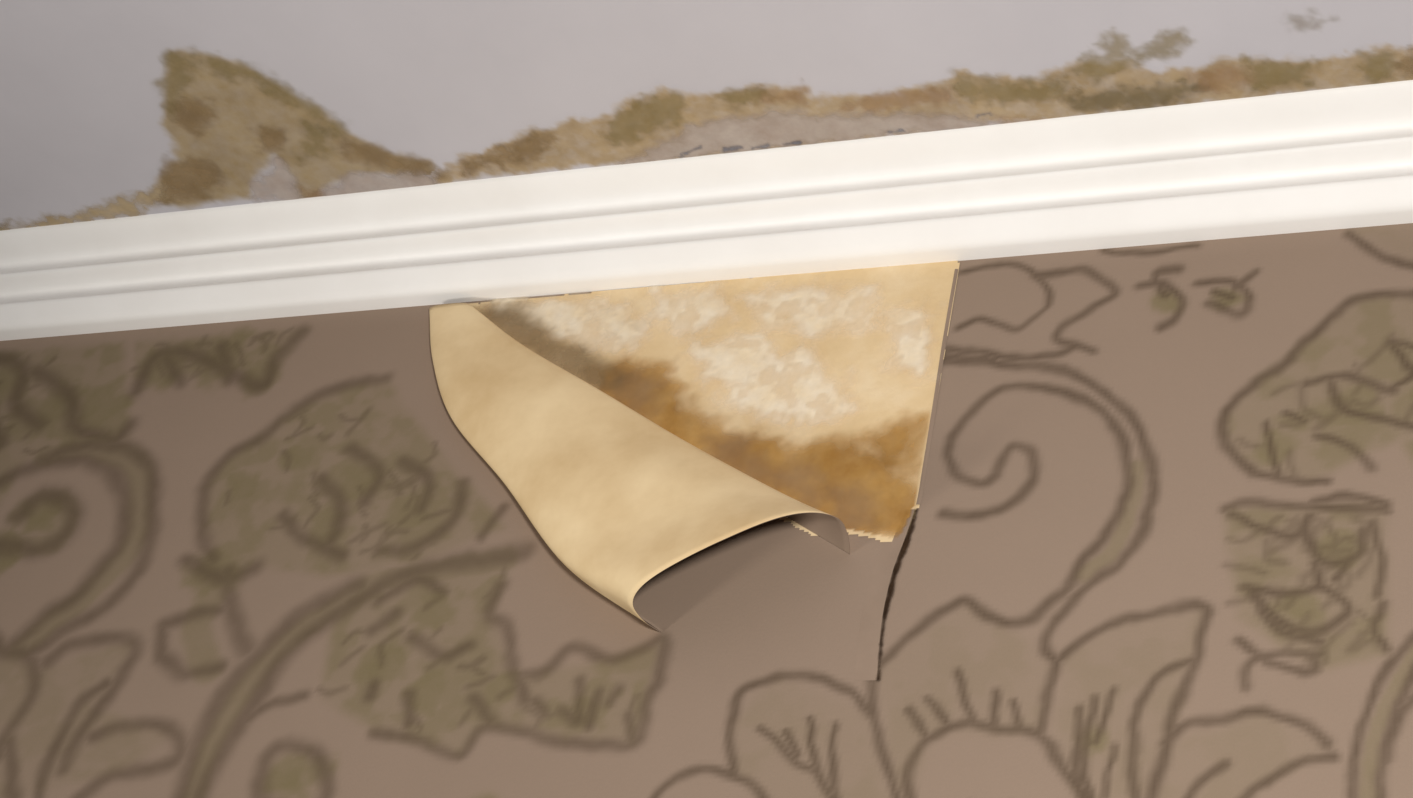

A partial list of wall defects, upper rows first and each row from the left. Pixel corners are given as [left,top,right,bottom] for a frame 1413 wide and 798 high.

leakage [27,34,1413,228]
flaking render [516,261,960,542]